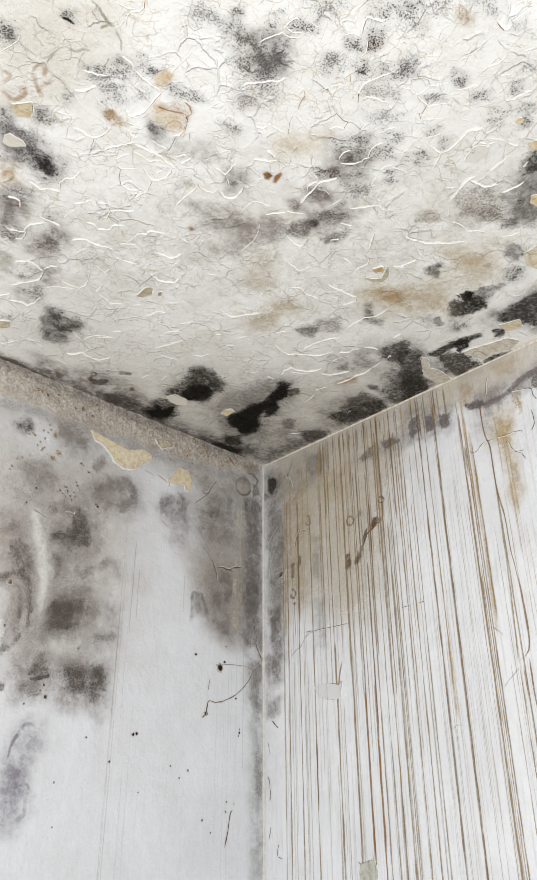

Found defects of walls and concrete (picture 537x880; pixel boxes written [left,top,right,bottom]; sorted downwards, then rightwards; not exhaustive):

leakage [218,6,319,110]
leakage [319,0,421,84]
spalling [2,132,27,147]
leakage [0,106,68,186]
leakage [268,128,404,244]
peeling [344,175,524,282]
leakage [0,357,228,424]
spalling [0,358,262,493]
spalling [420,356,453,384]
spalling [461,319,524,360]
leakage [191,243,537,715]
crack [202,625,263,718]